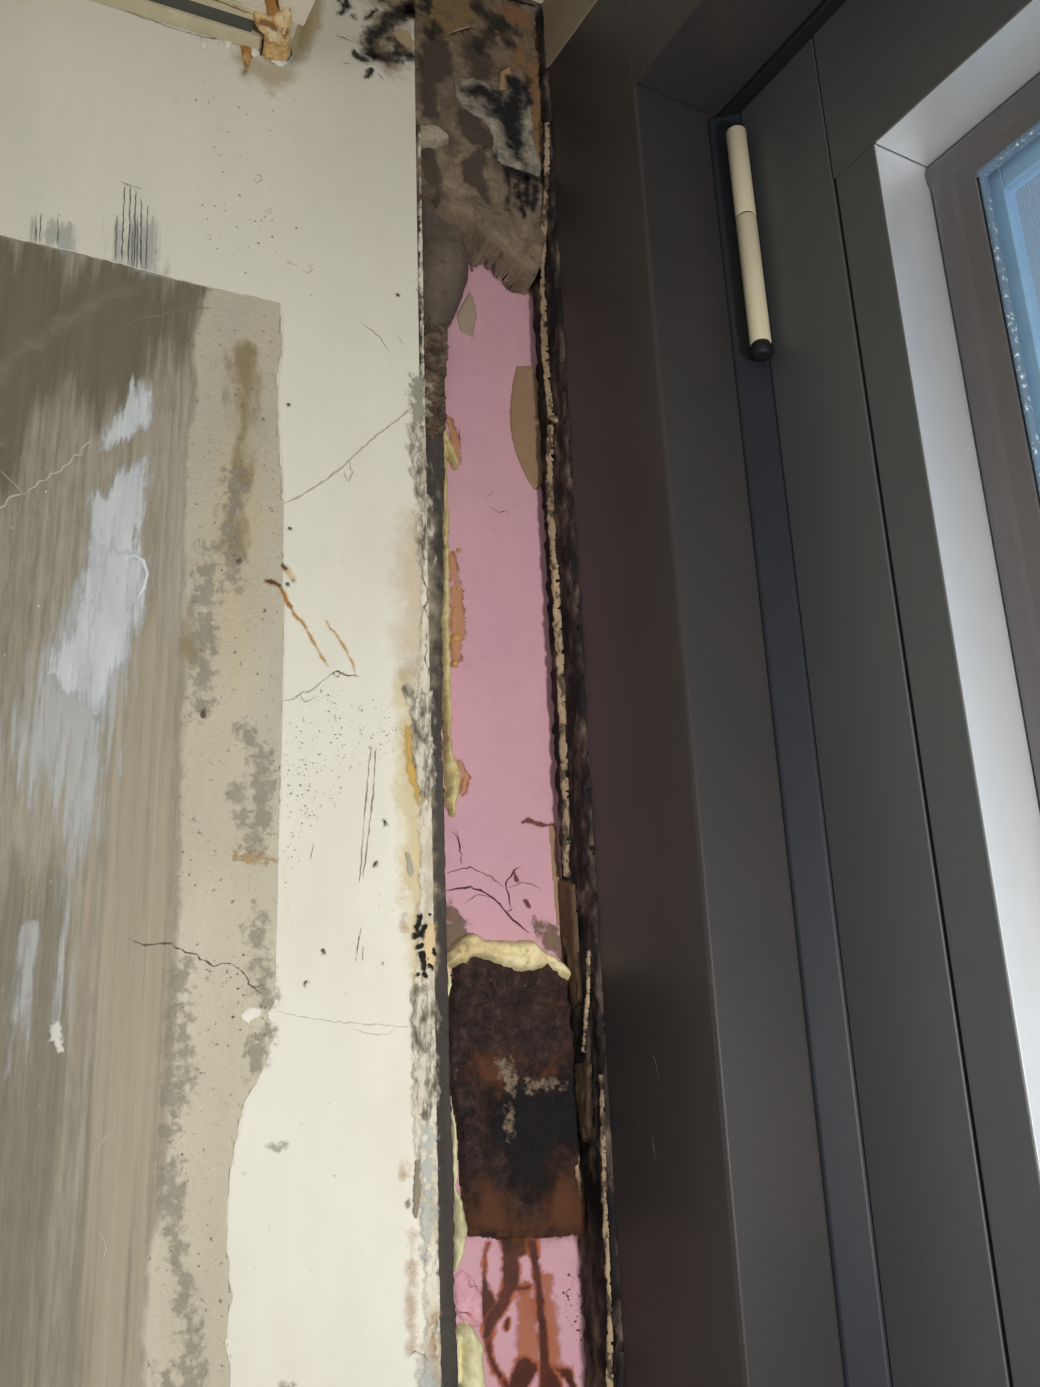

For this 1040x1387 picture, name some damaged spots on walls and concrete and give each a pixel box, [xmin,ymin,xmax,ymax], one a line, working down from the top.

damp [241,0,320,84]
damp [423,148,443,188]
damp [338,0,544,154]
peeling [453,67,544,178]
damp [458,109,544,218]
crack [281,670,359,703]
peeling [0,233,287,1387]
crack [446,866,541,933]
corrosion [476,1057,514,1083]
corrosion [471,1178,584,1387]